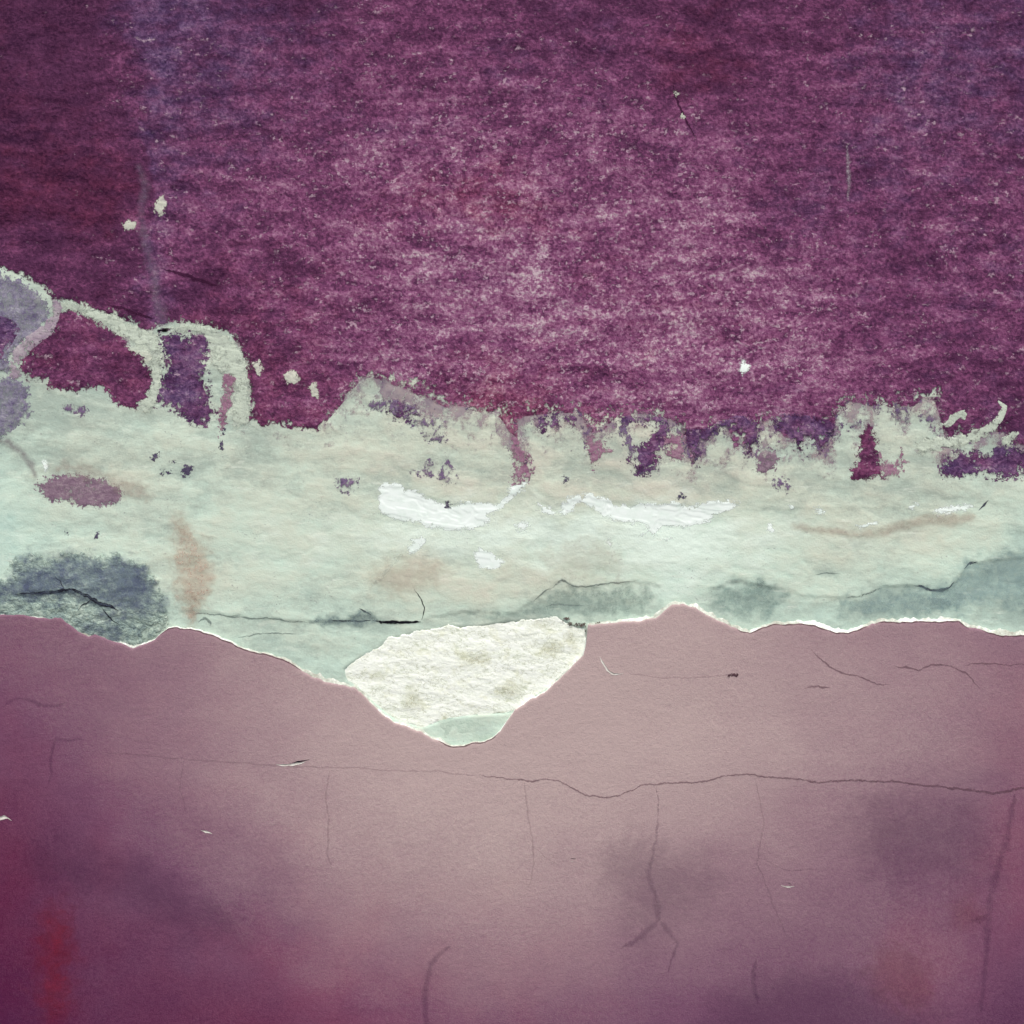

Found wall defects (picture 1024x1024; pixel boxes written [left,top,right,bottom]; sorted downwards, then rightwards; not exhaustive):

peeling [0,266,1024,746]
crack [19,578,119,625]
water stain [6,560,151,618]
crack [333,589,425,624]
crack [918,562,976,592]